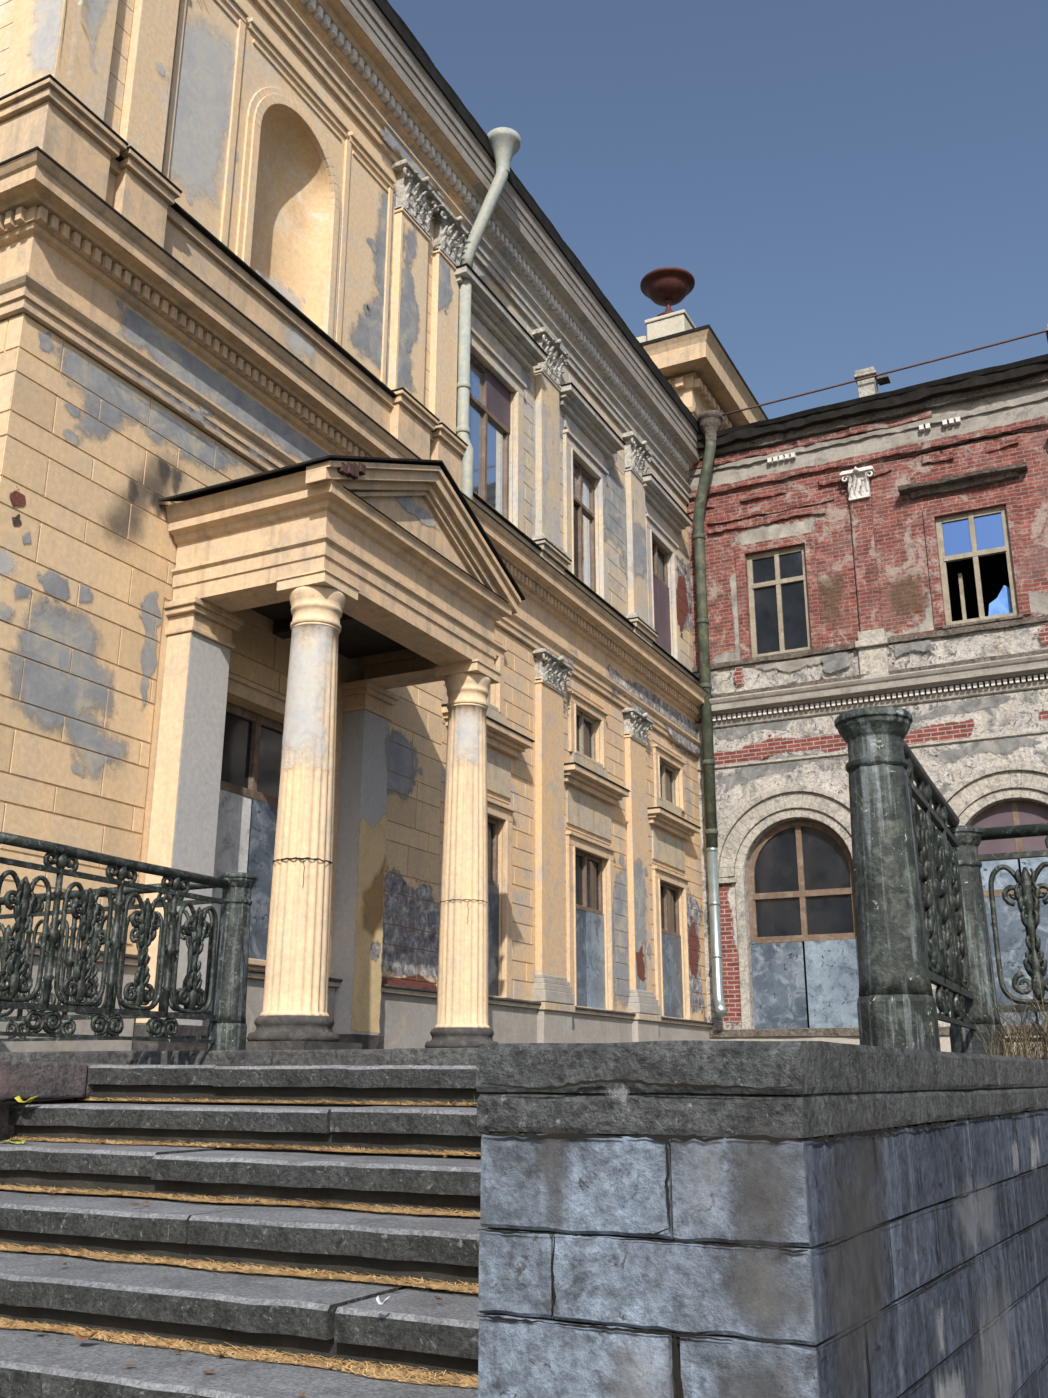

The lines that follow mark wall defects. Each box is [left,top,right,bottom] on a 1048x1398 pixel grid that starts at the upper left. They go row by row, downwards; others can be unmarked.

peeling [157,22,238,204]
peeling [256,270,305,310]
peeling [350,191,419,395]
peeling [438,256,459,320]
peeling [39,301,366,481]
peeling [0,486,127,779]
peeling [886,632,936,661]
peeling [386,729,423,800]
peeling [370,867,440,990]
flaking render [686,877,741,1028]
crack [672,1334,684,1398]